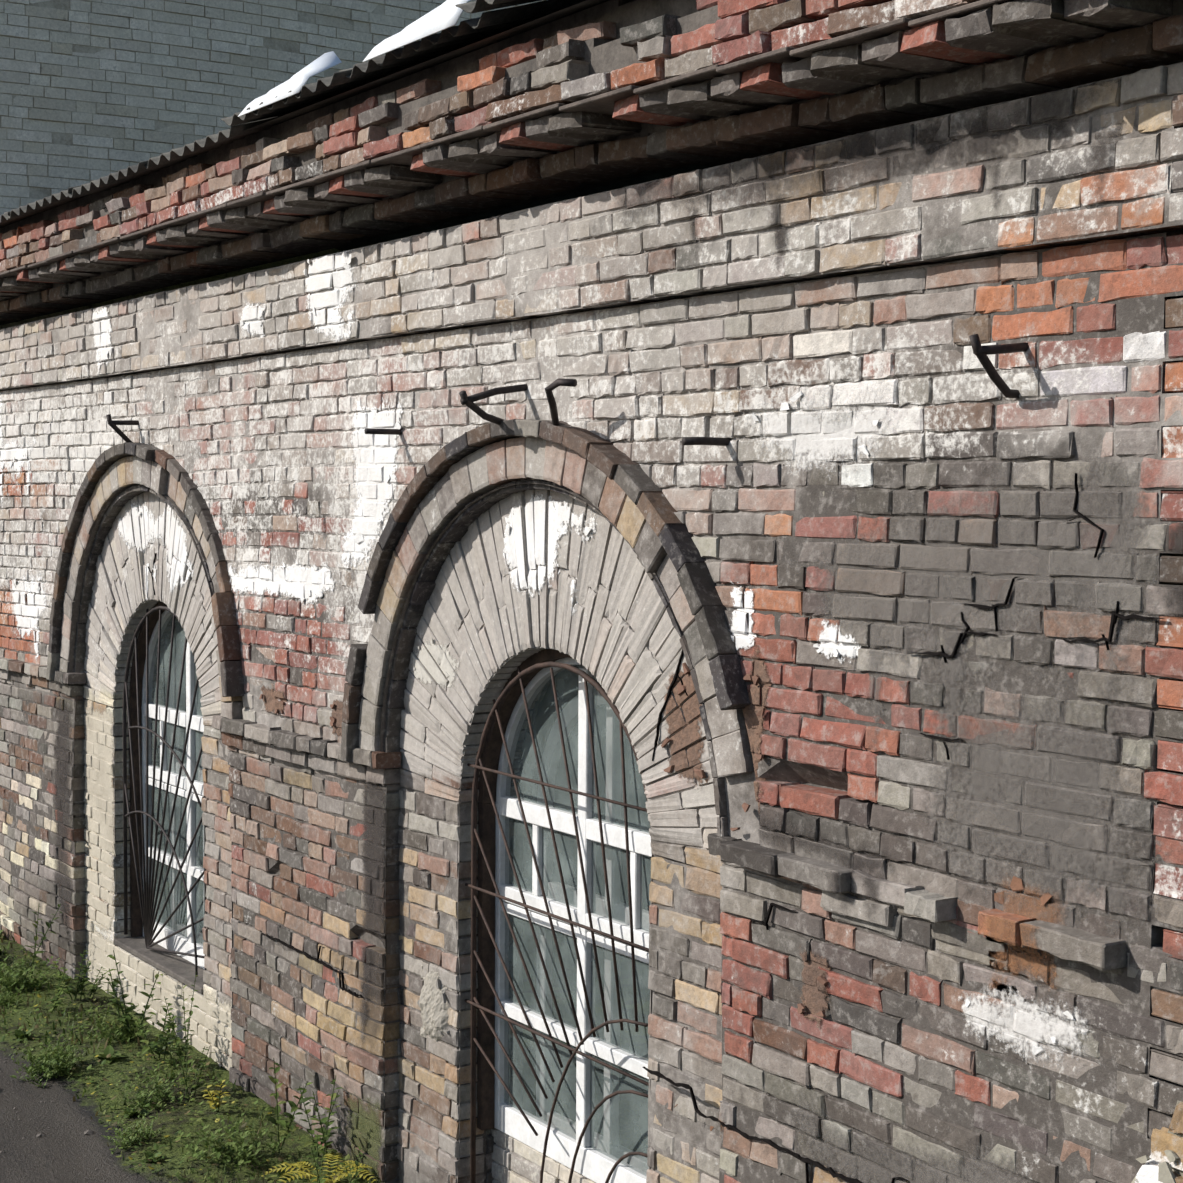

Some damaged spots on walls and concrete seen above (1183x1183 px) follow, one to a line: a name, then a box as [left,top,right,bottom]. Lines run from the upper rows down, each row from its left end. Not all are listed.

peeling [91,306,113,375]
peeling [239,302,265,339]
peeling [303,250,359,342]
peeling [228,397,403,605]
crack [1068,473,1104,558]
crack [907,577,1018,663]
crack [1062,601,1163,650]
spalling [661,663,709,785]
crack [643,1066,862,1183]
peeling [1135,1150,1179,1183]